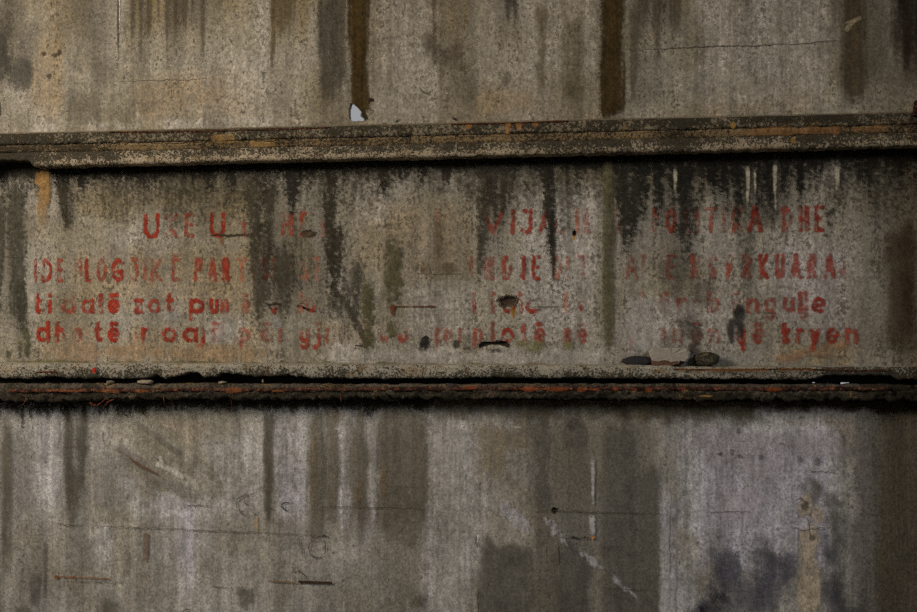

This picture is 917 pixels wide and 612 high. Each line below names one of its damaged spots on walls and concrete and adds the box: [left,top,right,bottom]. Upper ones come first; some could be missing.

water stain [270,0,295,67]
water stain [317,0,369,112]
water stain [600,0,625,119]
crack [641,39,847,50]
water stain [844,0,864,104]
water stain [890,0,917,68]
water stain [0,148,917,364]
spalling [496,294,520,318]
water stain [0,397,917,612]